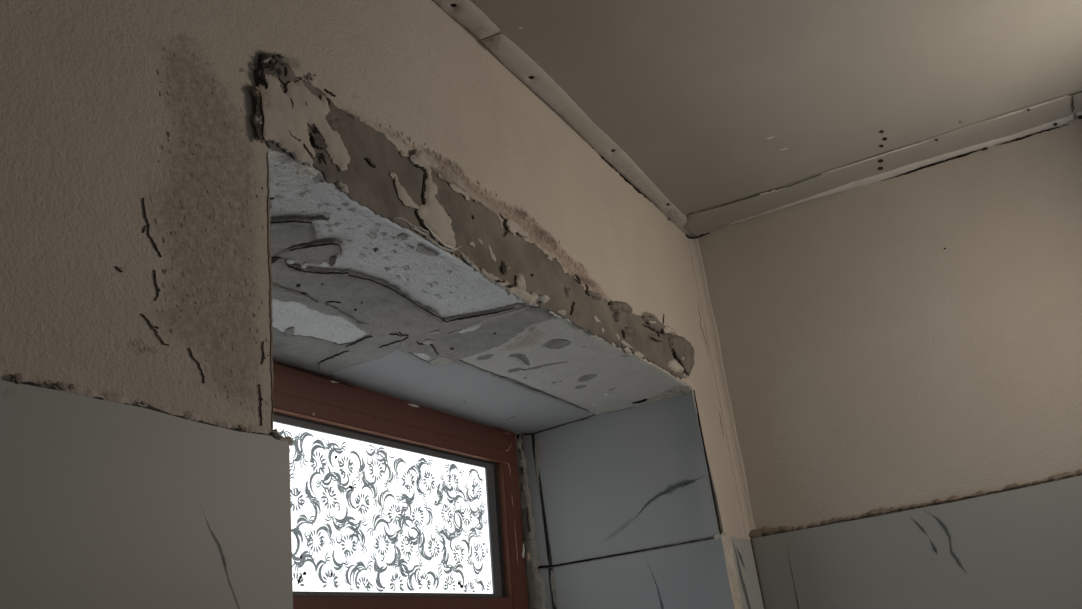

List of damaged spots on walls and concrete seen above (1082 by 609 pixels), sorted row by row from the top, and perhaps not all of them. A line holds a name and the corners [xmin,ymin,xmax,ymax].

crack [141,198,205,384]
peeling [239,52,695,429]